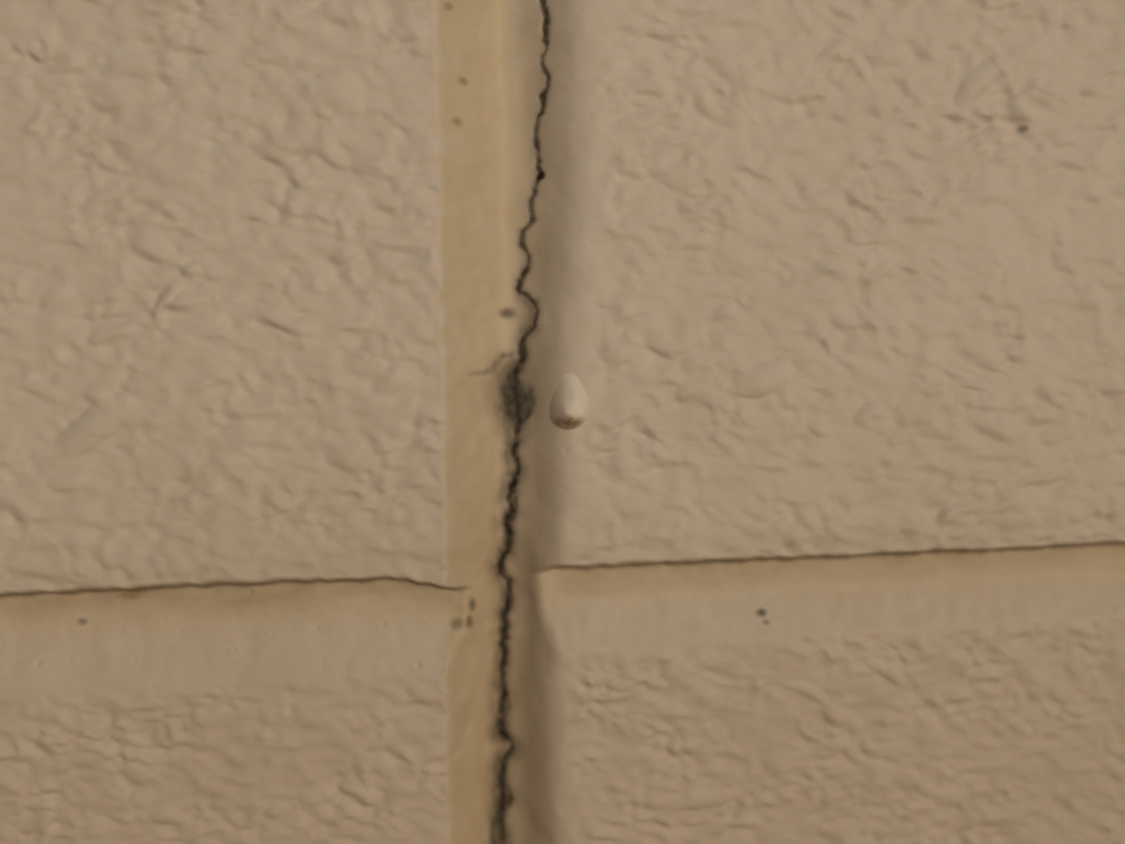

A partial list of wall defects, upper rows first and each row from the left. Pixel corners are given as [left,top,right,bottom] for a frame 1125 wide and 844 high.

crack [513,0,549,376]
crack [492,410,531,844]